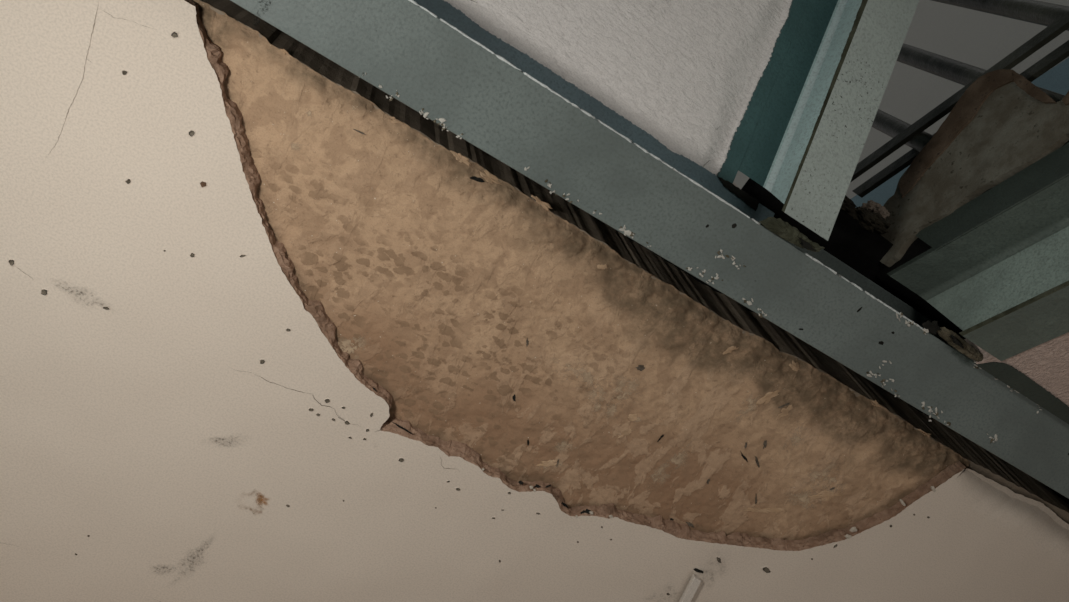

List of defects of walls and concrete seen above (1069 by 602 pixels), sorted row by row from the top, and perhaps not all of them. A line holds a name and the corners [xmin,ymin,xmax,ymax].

crack [45,8,153,159]
flaking render [192,0,970,551]
crack [237,370,345,421]